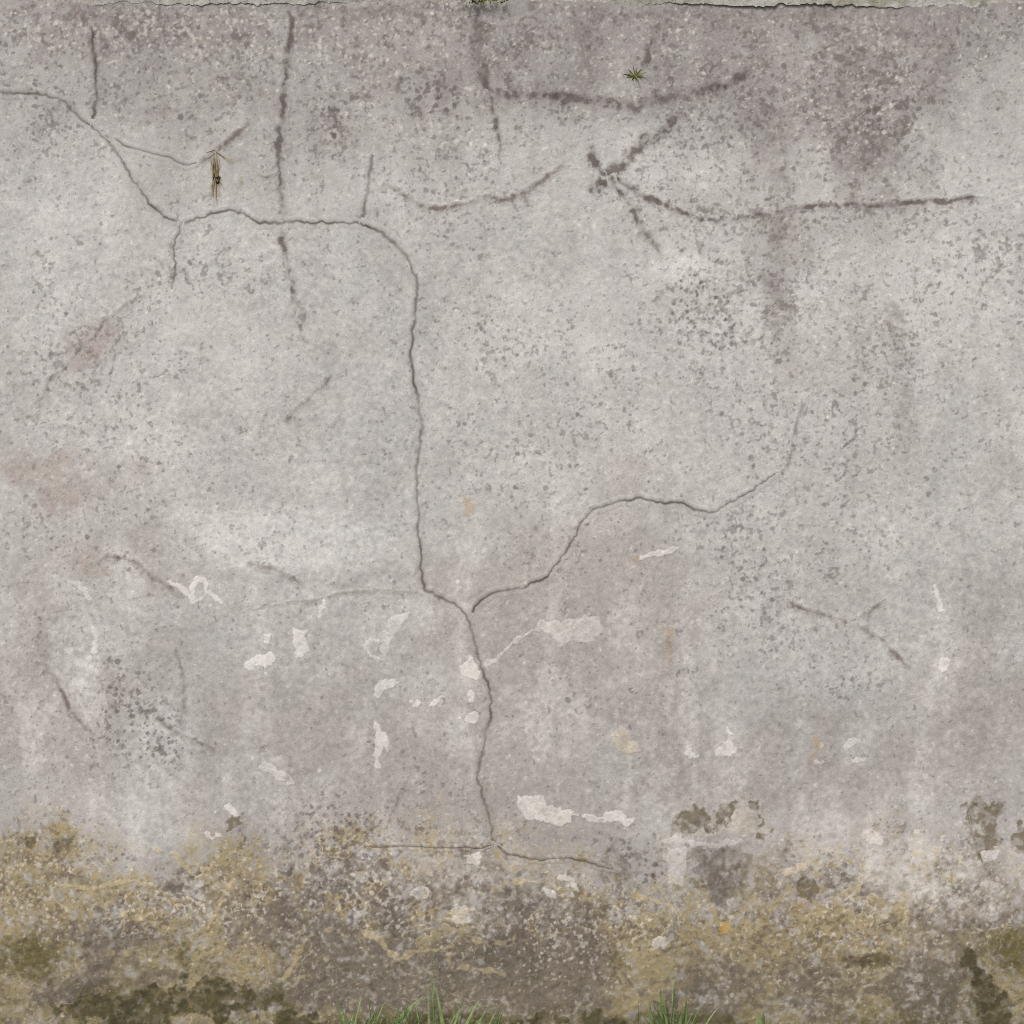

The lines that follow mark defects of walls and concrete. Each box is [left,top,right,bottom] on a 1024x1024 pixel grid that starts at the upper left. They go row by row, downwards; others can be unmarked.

crack [464,0,989,259]
crack [0,8,825,949]
peeling [167,575,224,605]
peeling [243,633,276,671]
peeling [458,612,604,724]
peeling [373,720,390,770]
spalling [516,790,774,910]
leakage [856,835,1012,927]
spalling [958,794,1024,868]
leakage [44,926,349,1024]
leakage [363,929,508,978]
leakage [906,956,924,983]